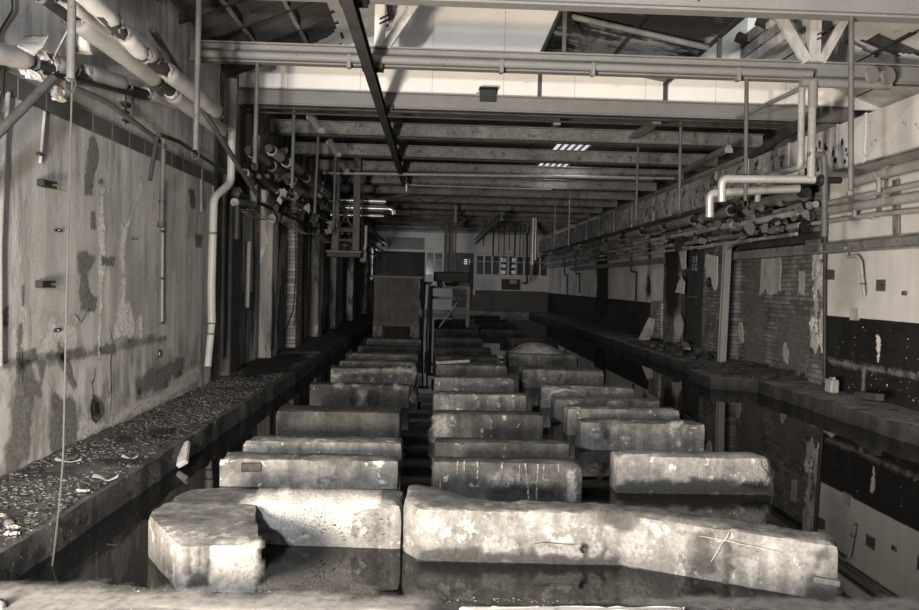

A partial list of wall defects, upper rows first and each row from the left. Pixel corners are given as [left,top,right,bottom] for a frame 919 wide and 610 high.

water stain [3,178,200,474]
peeling [809,254,823,354]